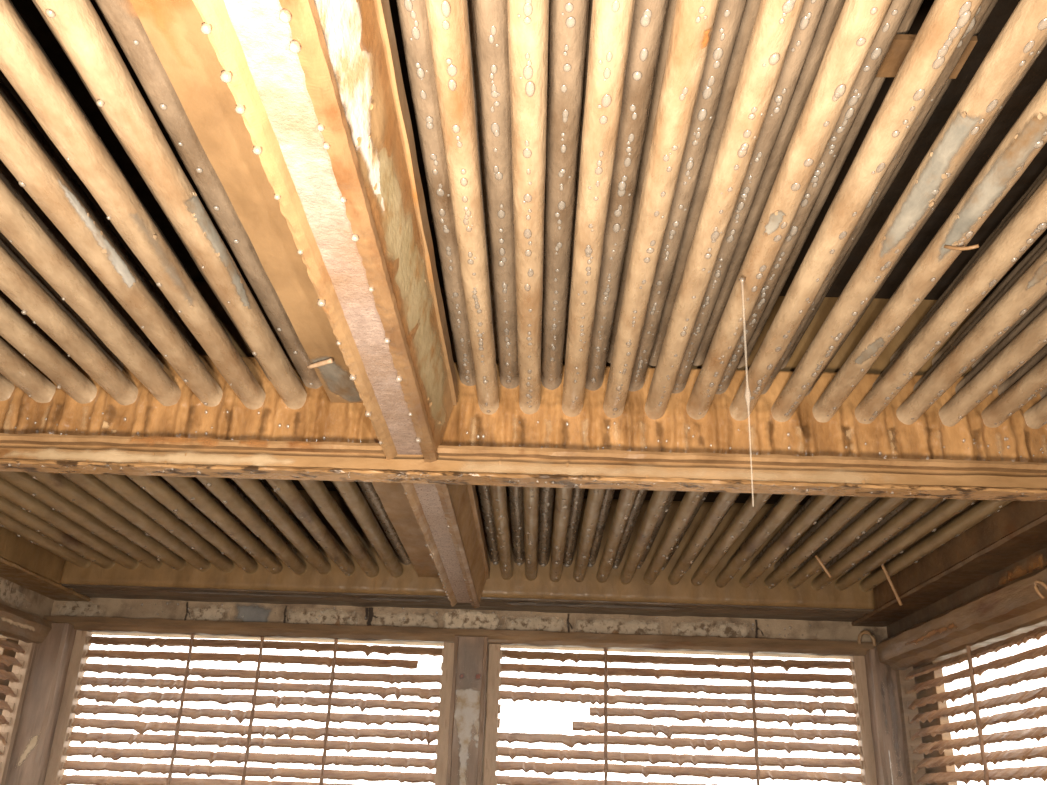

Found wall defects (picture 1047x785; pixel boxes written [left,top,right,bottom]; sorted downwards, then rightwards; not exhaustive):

peeling [59,180,135,288]
peeling [881,112,979,257]
peeling [939,113,1047,259]
peeling [454,689,480,785]